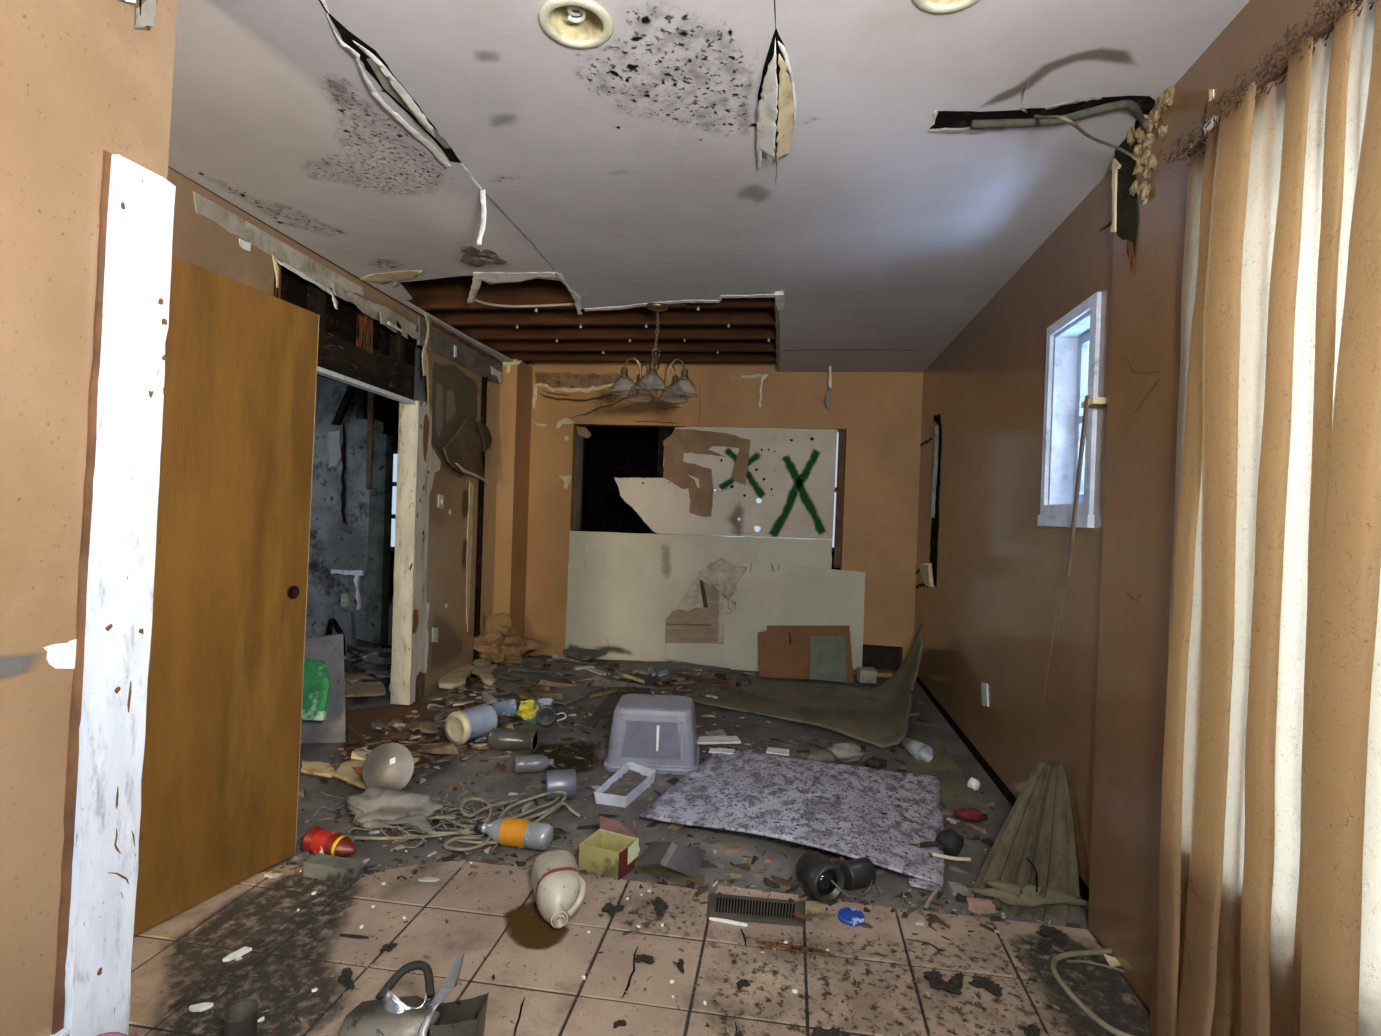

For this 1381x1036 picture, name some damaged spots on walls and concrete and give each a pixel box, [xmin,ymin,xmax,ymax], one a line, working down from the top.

leakage [313,92,442,194]
crack [319,0,555,271]
leakage [582,7,757,140]
crack [928,95,1155,275]
flaking render [503,360,636,441]
spalling [583,291,784,378]